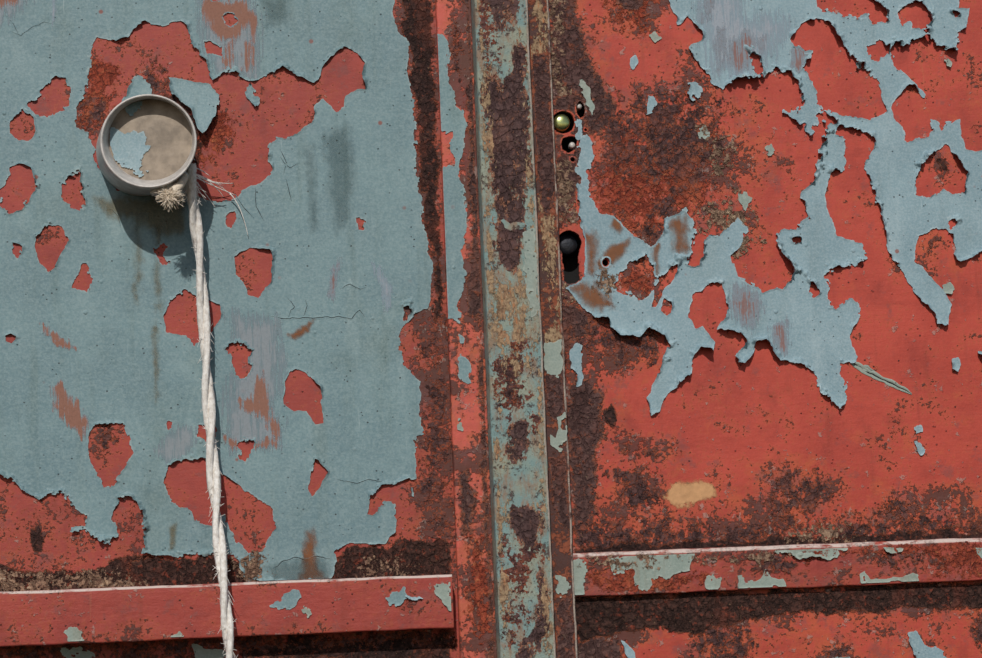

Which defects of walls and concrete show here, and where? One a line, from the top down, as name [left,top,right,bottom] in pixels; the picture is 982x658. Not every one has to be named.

peeling [8,17,369,231]
peeling [0,162,40,217]
peeling [566,0,982,416]
peeling [10,218,72,274]
rust [291,323,311,338]
peeling [161,0,472,618]
rust [300,0,982,658]
peeling [0,420,214,573]
peeling [608,554,695,591]
peeling [737,569,786,588]
rust [0,629,458,658]
peeling [907,631,947,658]